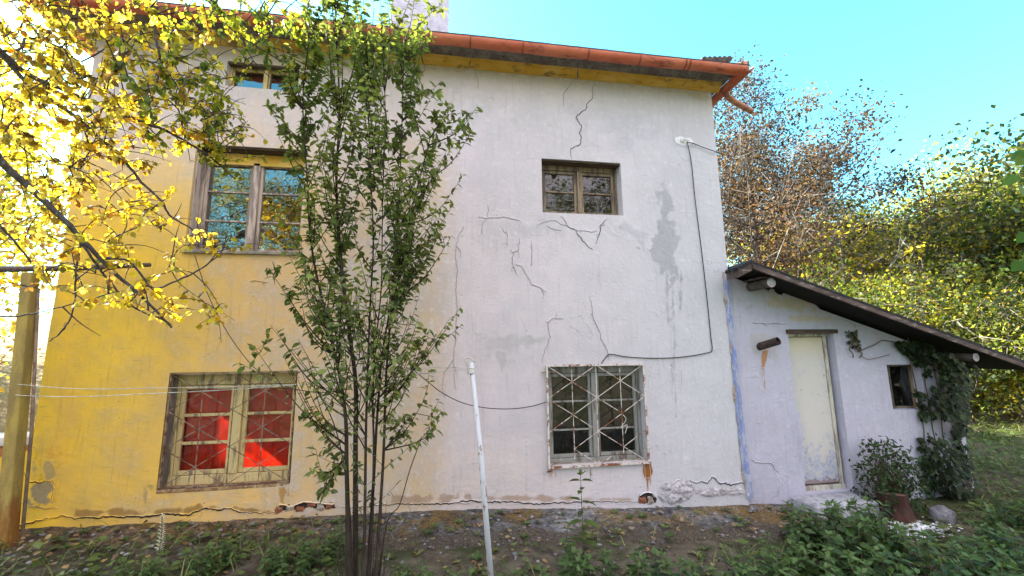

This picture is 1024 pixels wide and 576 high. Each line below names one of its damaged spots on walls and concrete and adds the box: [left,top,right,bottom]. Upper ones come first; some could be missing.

crack [563,69,595,158]
crack [442,208,609,397]
leakage [608,174,686,419]
peeling [727,322,738,426]
rust [760,349,773,395]
peeling [21,480,58,508]
crack [19,471,271,527]
flaking render [275,501,336,514]
rust [641,460,654,492]
flaking render [638,439,750,505]